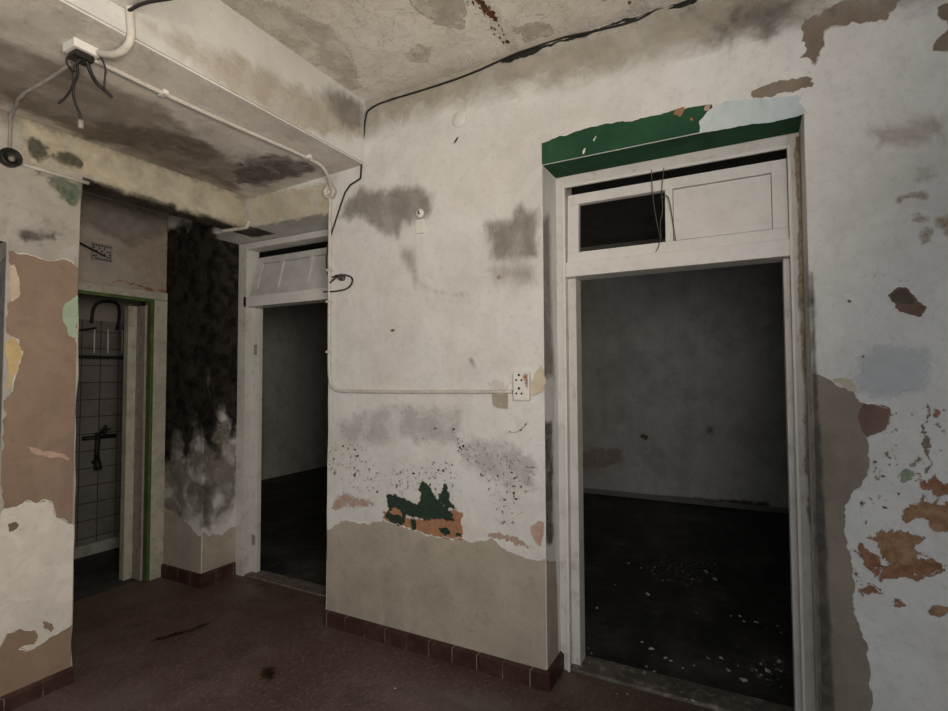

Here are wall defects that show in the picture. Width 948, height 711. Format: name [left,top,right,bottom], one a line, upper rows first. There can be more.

crack [497,0,697,63]
peeling [800,0,902,65]
peeling [750,76,815,99]
leakage [345,189,429,234]
leakage [0,57,329,528]
flaking render [885,285,929,319]
peeling [0,251,79,523]
peeling [813,375,948,711]
peeling [327,494,546,670]
peeling [0,621,72,697]